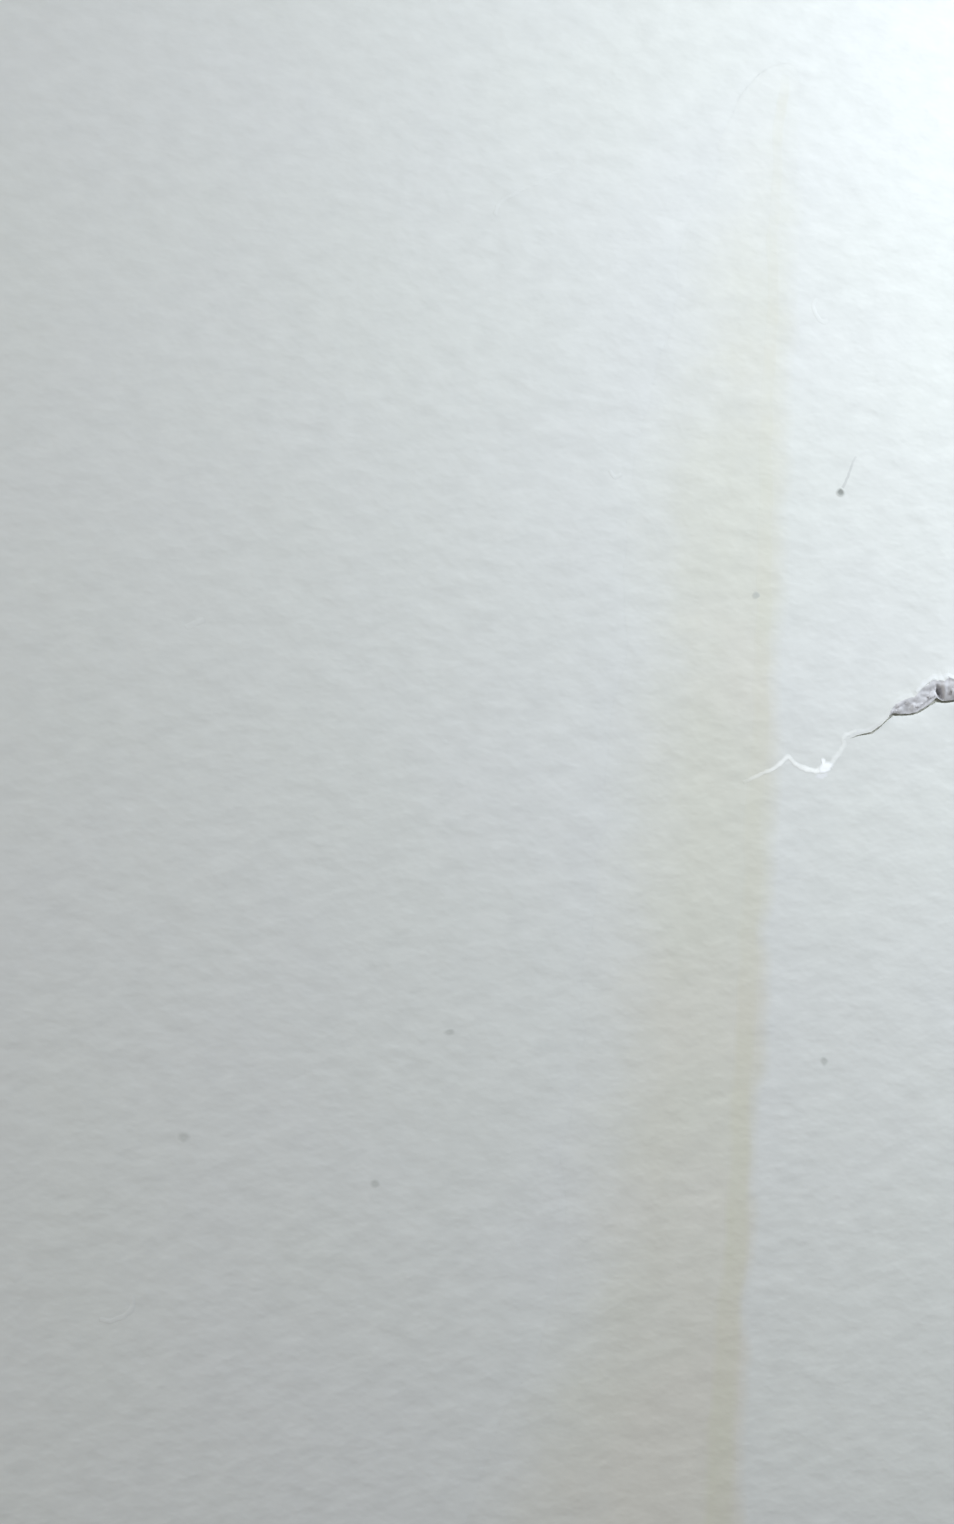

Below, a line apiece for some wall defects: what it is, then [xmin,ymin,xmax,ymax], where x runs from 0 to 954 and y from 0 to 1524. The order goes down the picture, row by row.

crack [743,673,954,784]